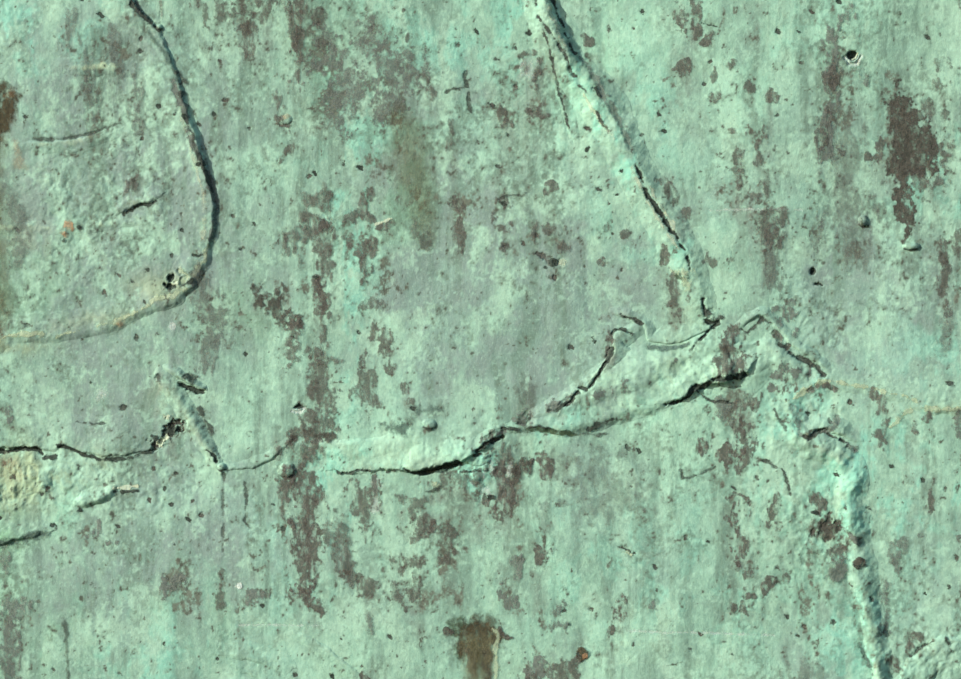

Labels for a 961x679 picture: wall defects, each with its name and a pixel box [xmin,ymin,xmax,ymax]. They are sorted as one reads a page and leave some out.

crack [129,0,163,28]
rust [0,81,22,141]
crack [34,123,117,141]
crack [535,0,690,269]
crack [171,70,219,286]
crack [122,200,157,216]
crack [149,373,204,394]
crack [336,298,858,476]
crack [0,444,152,462]
crack [680,466,716,480]
crack [0,530,48,548]
rust [442,614,513,679]